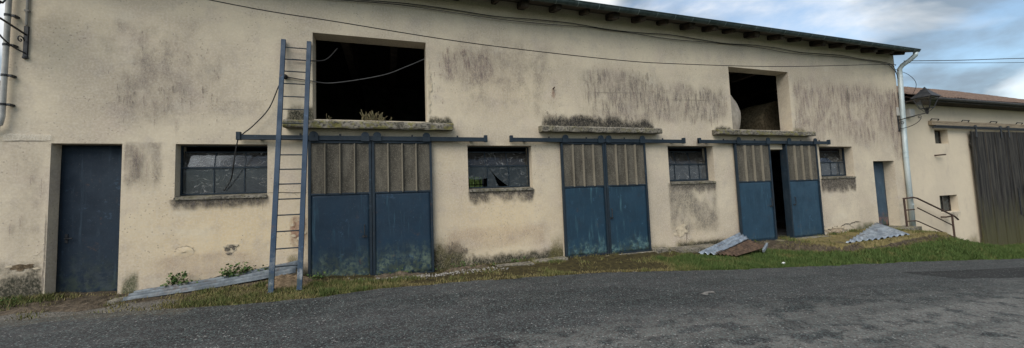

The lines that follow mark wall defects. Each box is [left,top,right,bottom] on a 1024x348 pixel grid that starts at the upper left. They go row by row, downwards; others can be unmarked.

damp [544,81,653,128]
flaking render [223,244,238,255]
damp [434,245,563,272]
damp [0,267,42,299]